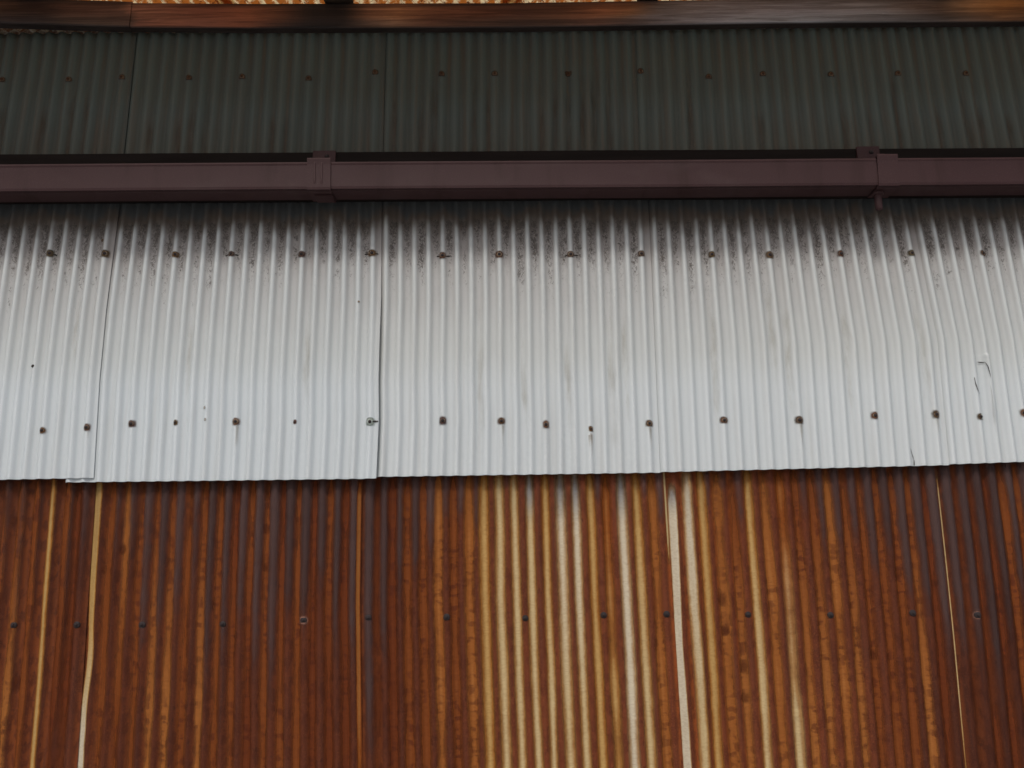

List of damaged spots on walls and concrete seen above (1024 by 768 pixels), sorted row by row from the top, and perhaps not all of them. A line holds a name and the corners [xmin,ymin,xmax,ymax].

water stain [0,223,105,281]
water stain [123,220,369,284]
water stain [389,218,638,284]
water stain [658,216,909,289]
water stain [921,216,1024,267]
corrosion [0,478,82,768]
corrosion [94,479,362,768]
corrosion [374,472,673,768]
corrosion [682,467,966,768]
corrosion [953,462,1024,768]